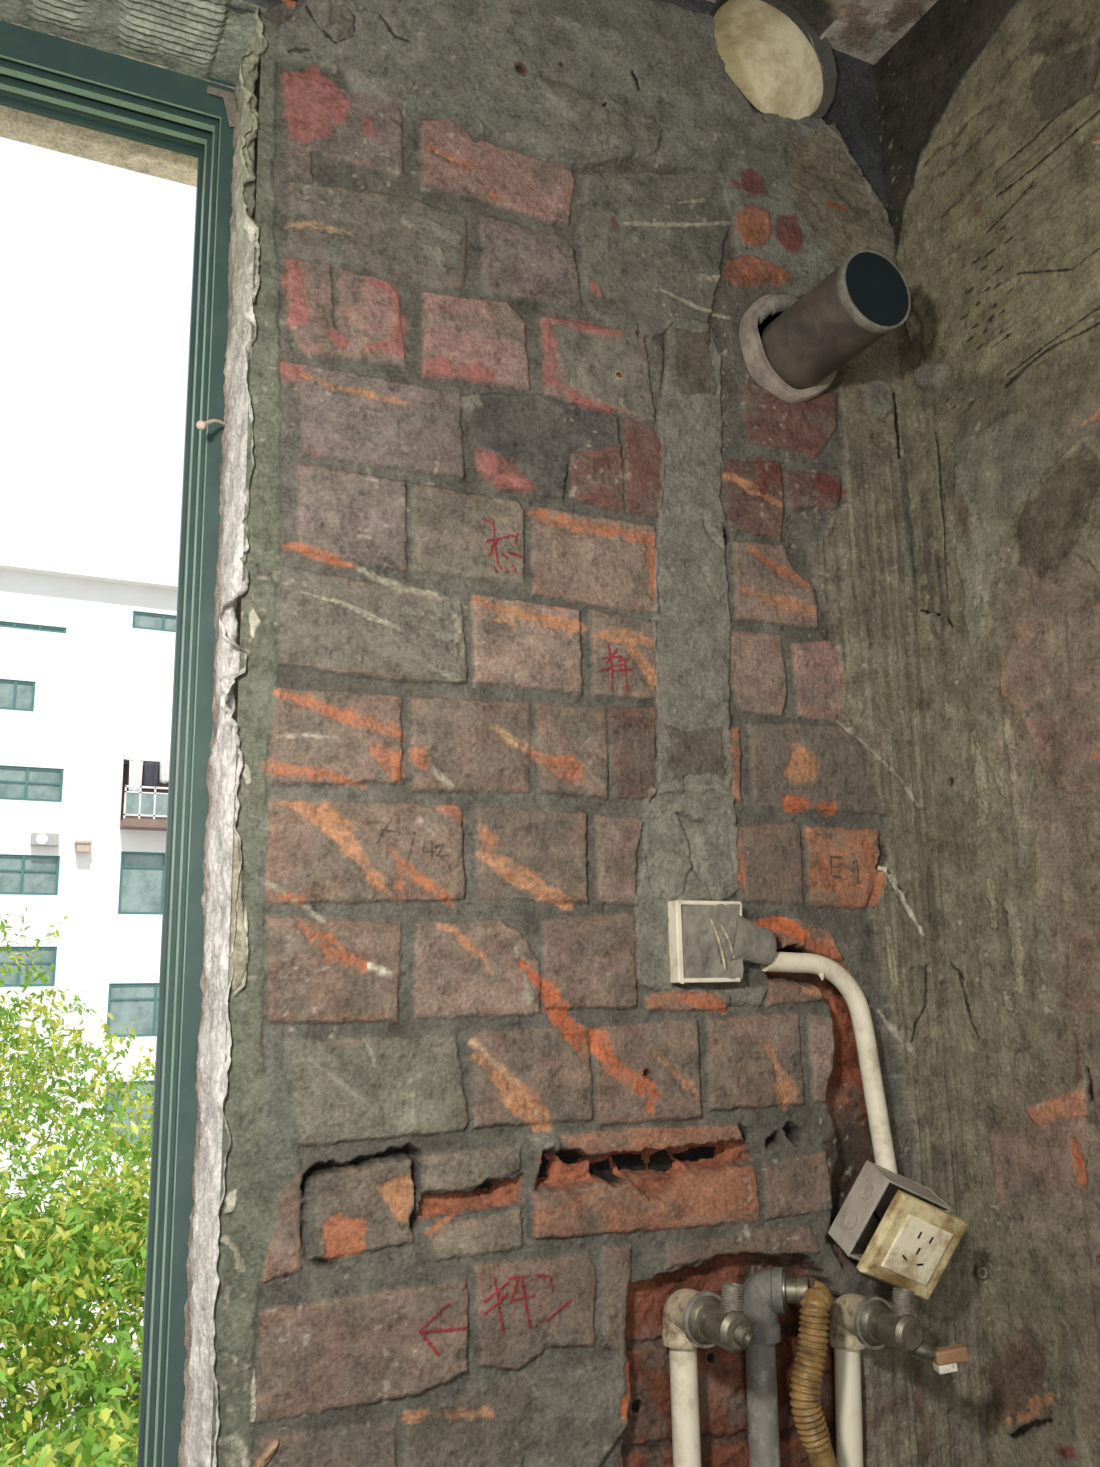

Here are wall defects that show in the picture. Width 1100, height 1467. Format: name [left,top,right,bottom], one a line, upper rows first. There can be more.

crack [985,93,1100,235]
crack [1016,246,1100,276]
crack [1003,306,1100,389]
spalling [466,1037,556,1134]
spalling [320,1211,370,1261]
spalling [374,1138,756,1238]